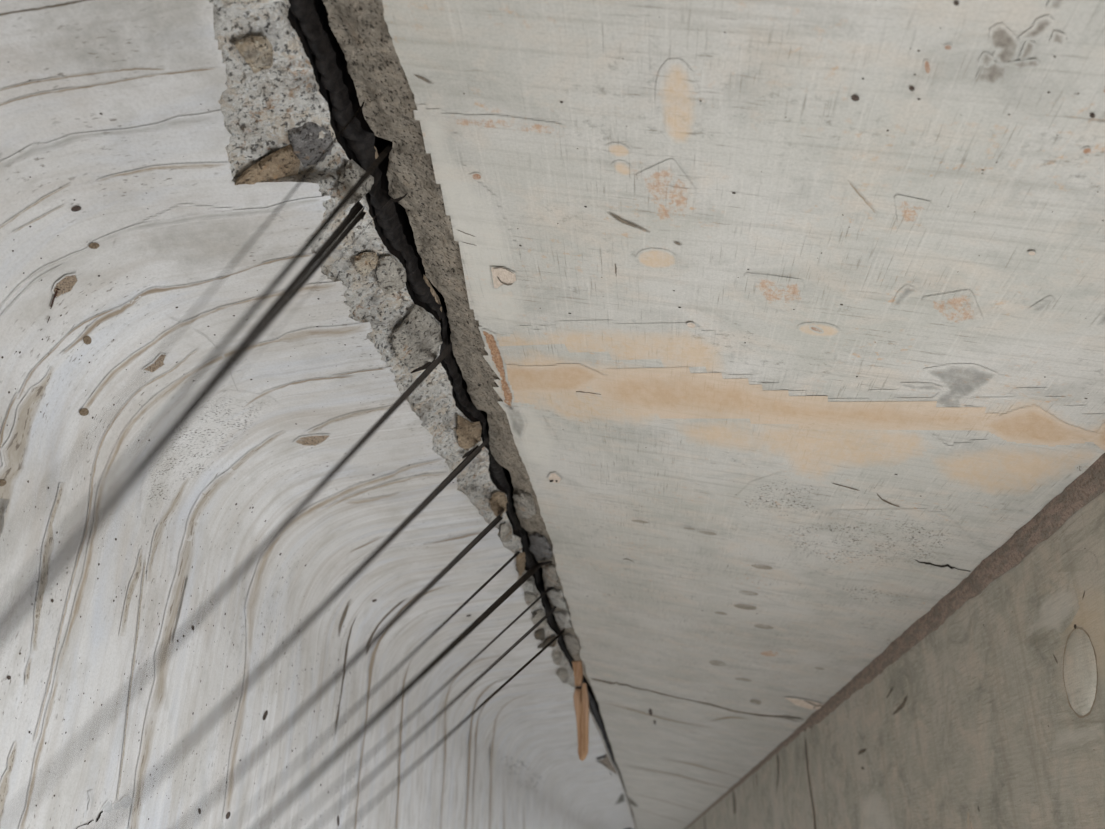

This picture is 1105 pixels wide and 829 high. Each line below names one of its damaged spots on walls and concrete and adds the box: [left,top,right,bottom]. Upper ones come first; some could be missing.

leakage [975,0,1068,85]
crack [0,0,816,829]
spalling [209,0,641,829]
corrosion [482,329,515,411]
leakage [413,104,1105,502]
crack [916,560,970,572]